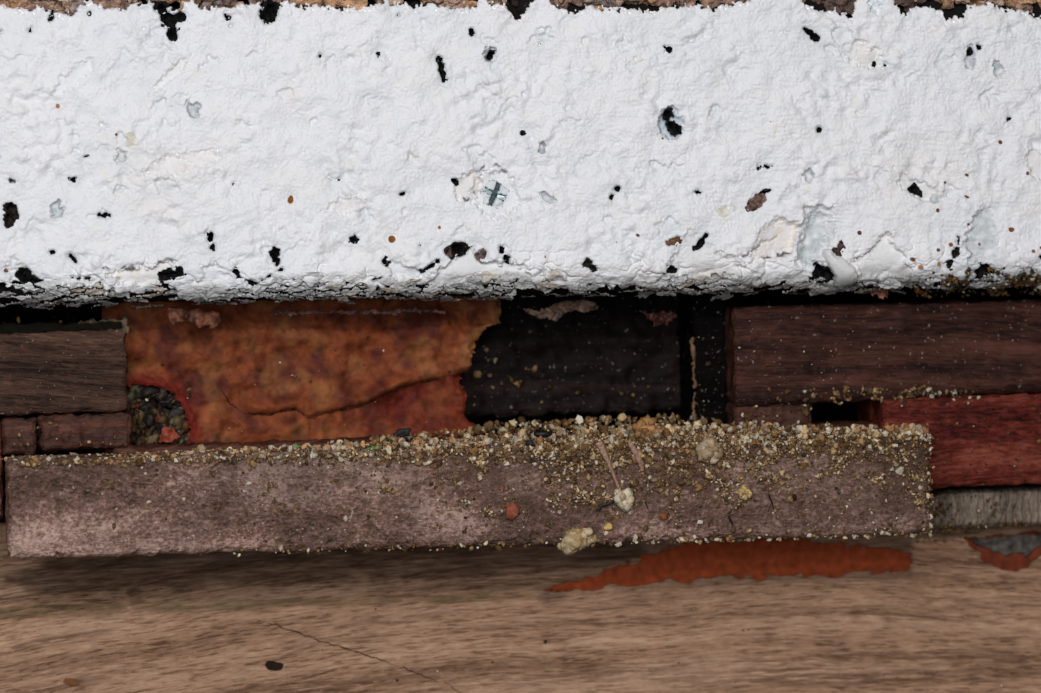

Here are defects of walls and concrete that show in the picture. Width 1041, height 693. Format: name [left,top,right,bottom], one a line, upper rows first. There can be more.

crack [222,378,445,419]
peeling [159,424,181,443]
peeling [972,534,1041,557]
crack [258,620,460,693]